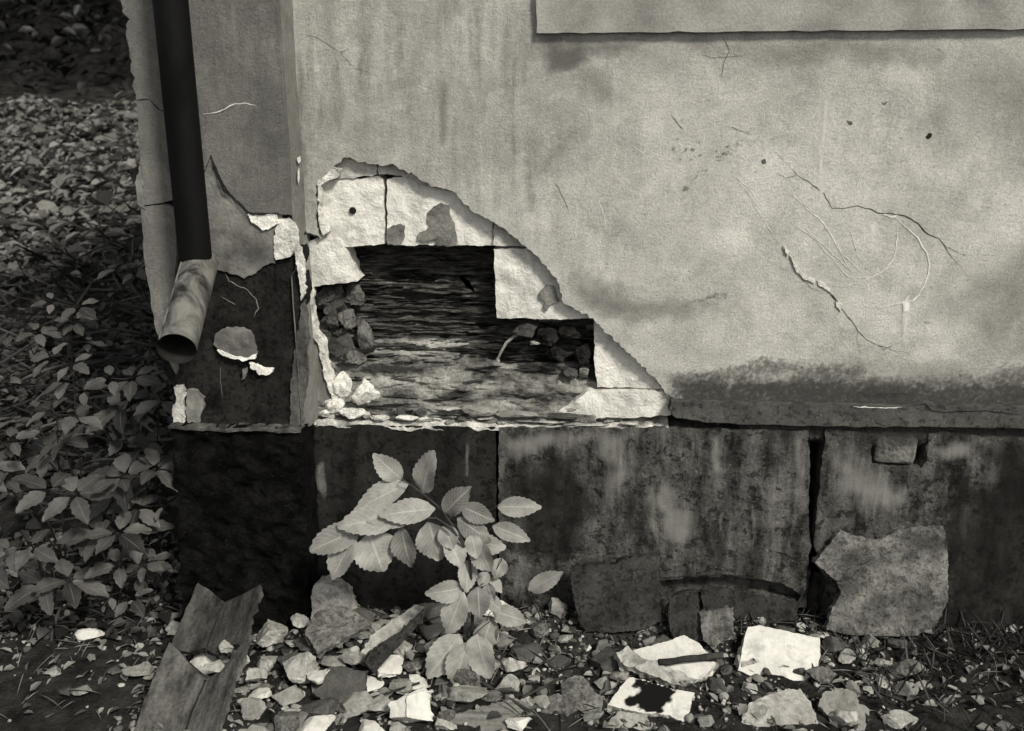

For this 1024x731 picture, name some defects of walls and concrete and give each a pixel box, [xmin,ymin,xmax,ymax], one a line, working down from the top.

peeling [135,164,147,209]
crack [773,149,969,277]
spalling [248,158,671,432]
crack [741,185,907,353]
peeling [213,326,274,380]
peeling [172,384,206,423]
water stain [673,360,1024,405]